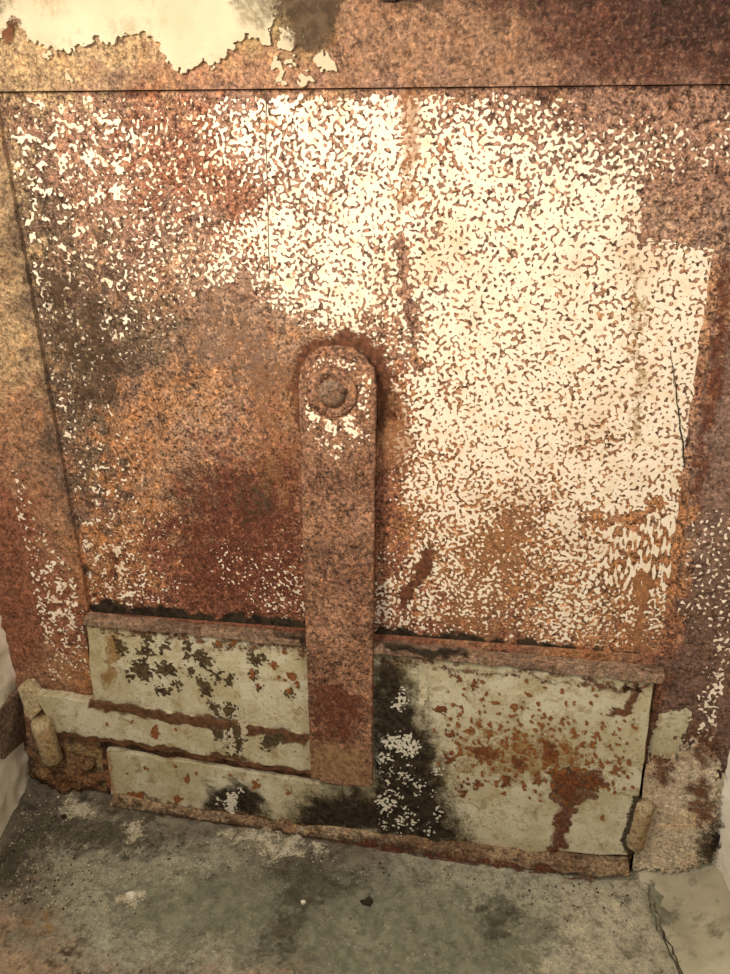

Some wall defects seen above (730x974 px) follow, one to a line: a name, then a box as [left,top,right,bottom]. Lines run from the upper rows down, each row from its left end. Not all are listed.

rust [287,327,398,430]
peeling [0,0,730,681]
rust [162,449,306,624]
leakage [50,793,166,861]
peeling [111,632,269,758]
rust [59,626,375,790]
leakage [108,826,557,974]
rust [333,655,651,883]
leakage [645,883,675,924]
crack [643,882,683,974]
rust [646,727,720,829]
peeling [647,508,730,853]